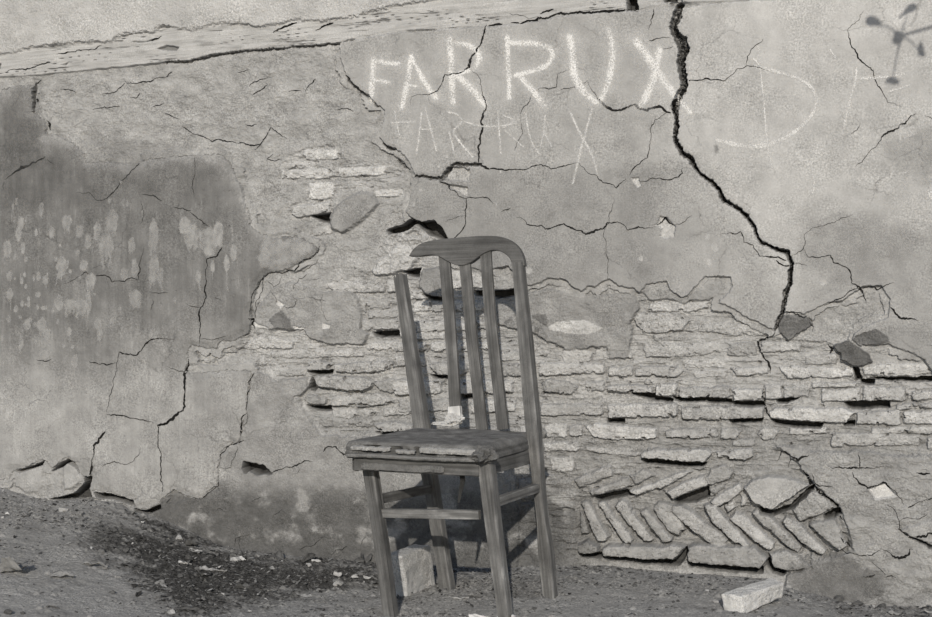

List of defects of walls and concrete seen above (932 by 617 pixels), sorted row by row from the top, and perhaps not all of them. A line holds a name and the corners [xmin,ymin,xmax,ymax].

crack [274,22,333,32]
crack [8,45,100,130]
crack [3,158,54,190]
crack [65,248,168,308]
crack [82,72,286,510]
spalling [0,44,476,567]
spalling [472,266,526,432]
spalling [654,215,676,239]
crack [410,7,932,417]
spalling [527,276,932,613]
spalling [438,475,491,568]
spalling [496,464,539,568]